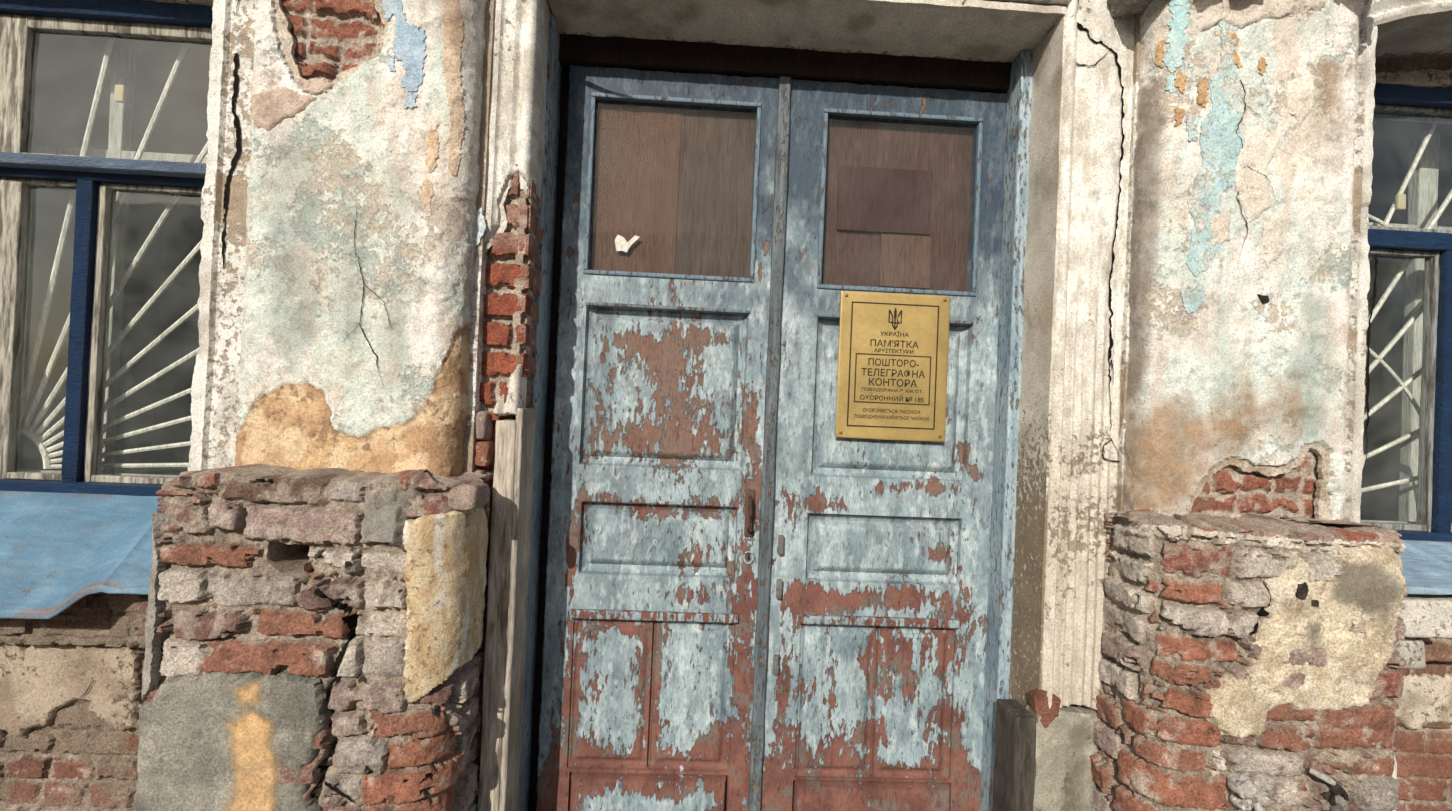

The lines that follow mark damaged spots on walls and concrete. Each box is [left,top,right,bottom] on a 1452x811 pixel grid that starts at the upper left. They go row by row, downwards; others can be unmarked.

crack [221,53,241,269]
flaking render [249,0,466,212]
crack [1076,0,1125,462]
peeling [235,164,537,704]
flaking render [1186,442,1331,520]
peeling [0,513,331,811]
crack [297,543,359,803]
peeling [1394,672,1452,731]